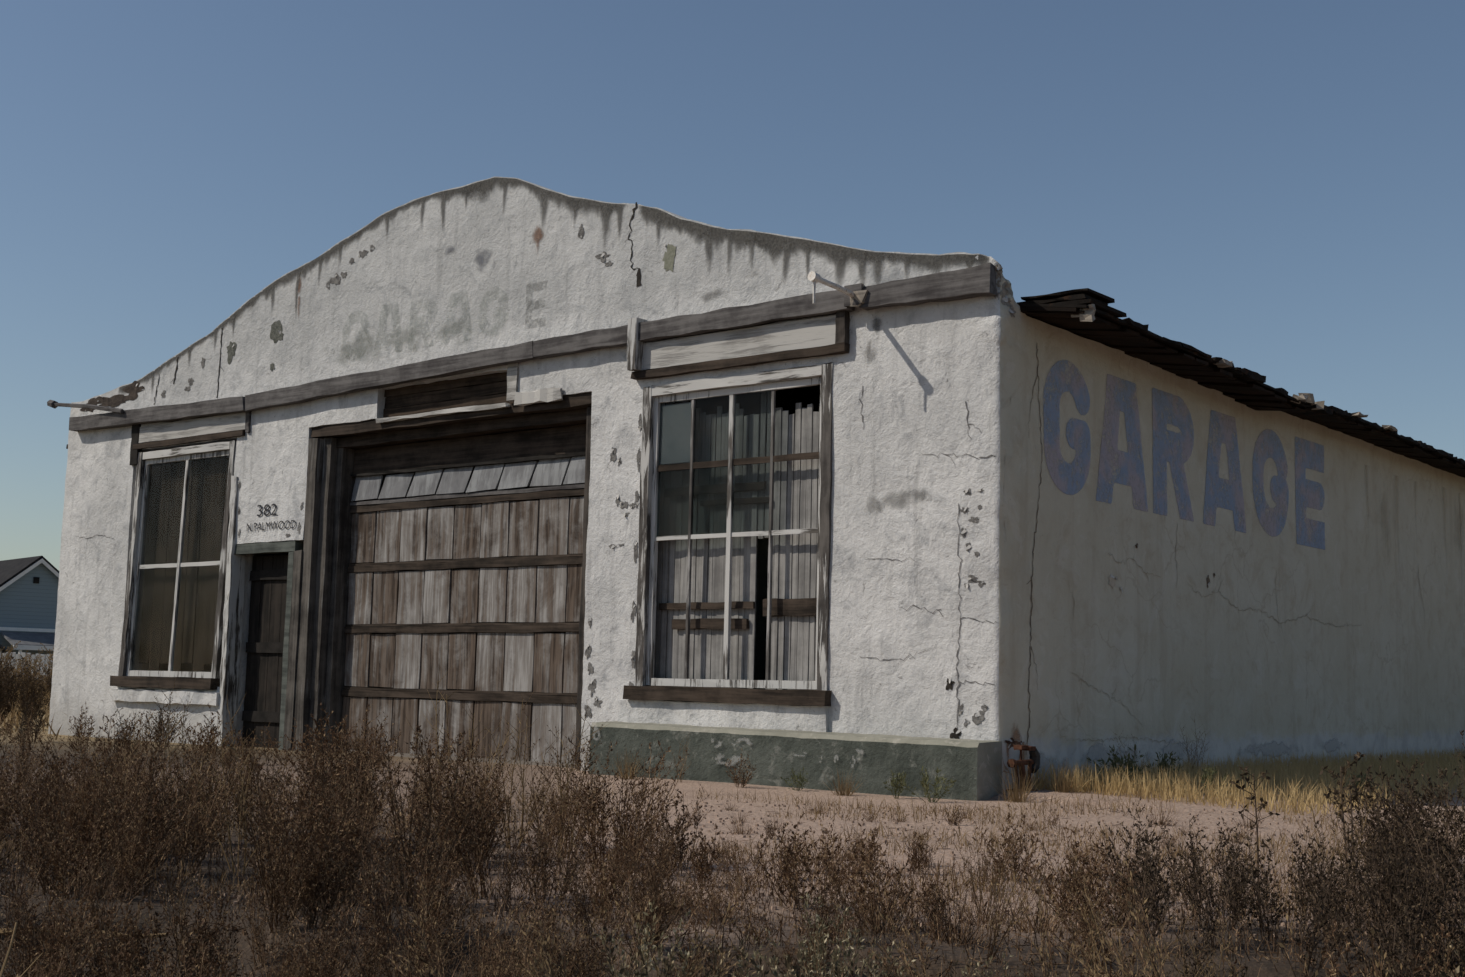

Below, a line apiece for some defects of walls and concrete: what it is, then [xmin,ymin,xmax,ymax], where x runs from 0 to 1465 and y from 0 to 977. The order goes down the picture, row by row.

damp [119,177,989,392]
crack [627,202,641,287]
peeling [610,413,642,472]
flaking render [615,491,639,517]
crack [861,349,1206,755]
flaking render [584,618,602,718]
flaking render [956,703,988,734]